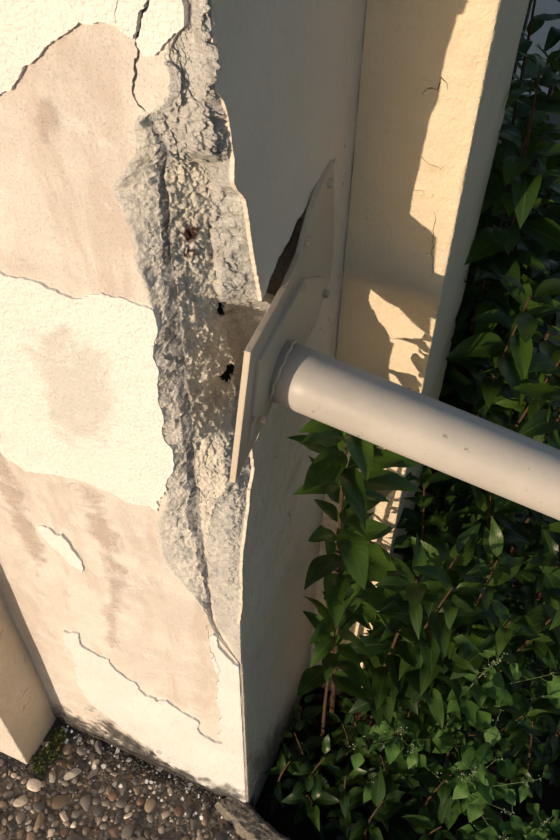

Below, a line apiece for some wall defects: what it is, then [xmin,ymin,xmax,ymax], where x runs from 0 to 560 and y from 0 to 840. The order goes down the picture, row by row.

crack [133,0,150,95]
corrosion [180,224,199,258]
peeling [0,0,311,803]
crack [146,113,213,618]
water stain [50,697,298,803]